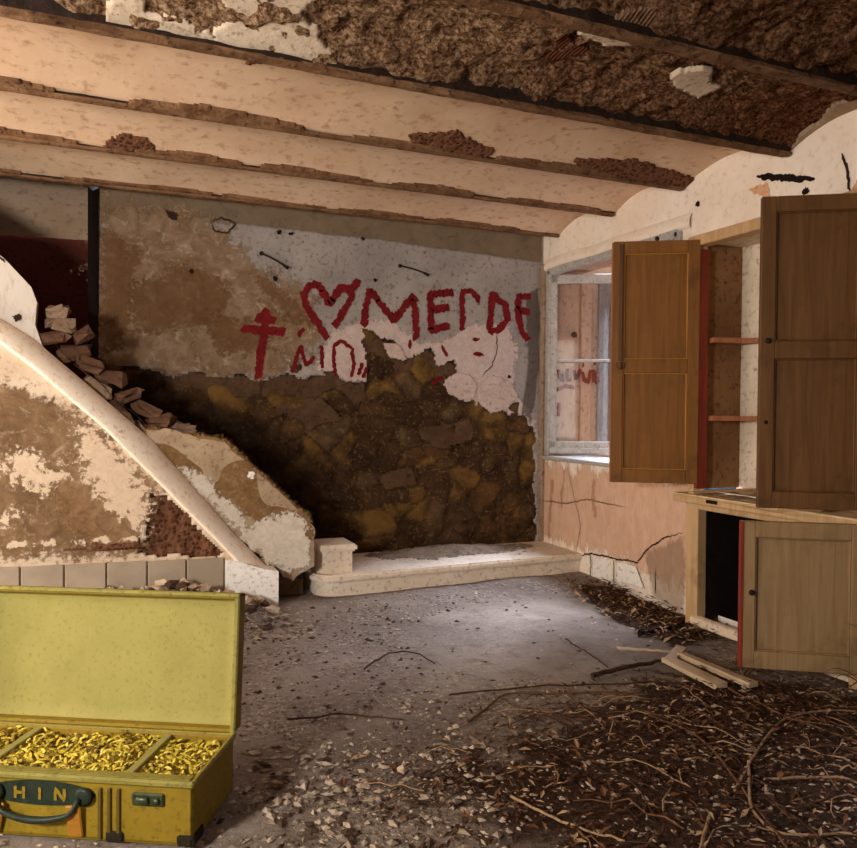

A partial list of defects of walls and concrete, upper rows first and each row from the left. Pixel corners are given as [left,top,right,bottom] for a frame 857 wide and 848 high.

flaking render [106,0,337,64]
flaking render [0,76,55,93]
flaking render [670,65,721,99]
flaking render [129,99,305,131]
flaking render [0,126,78,145]
flaking render [103,132,242,166]
flaking render [260,163,373,182]
flaking render [352,129,695,189]
flaking render [506,197,602,212]
flaking render [56,319,539,553]
peeling [0,422,223,557]
crack [545,473,683,594]